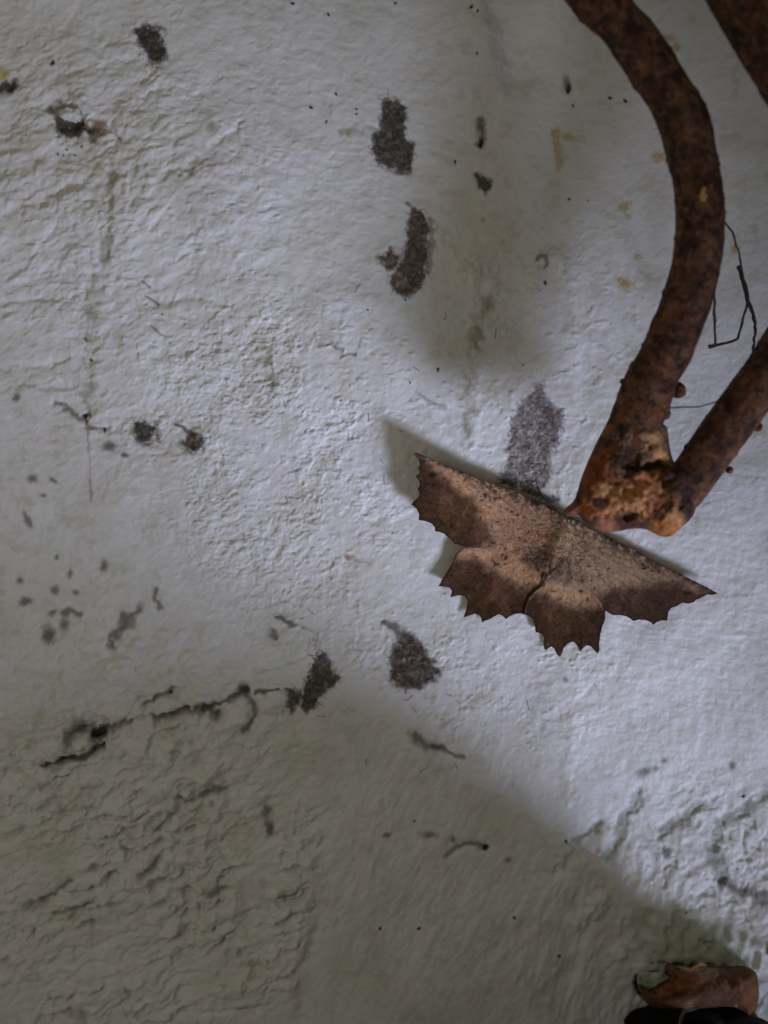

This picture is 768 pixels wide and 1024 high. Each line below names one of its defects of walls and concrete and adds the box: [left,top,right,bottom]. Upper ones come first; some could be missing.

crack [203,686,249,710]
crack [40,742,105,767]